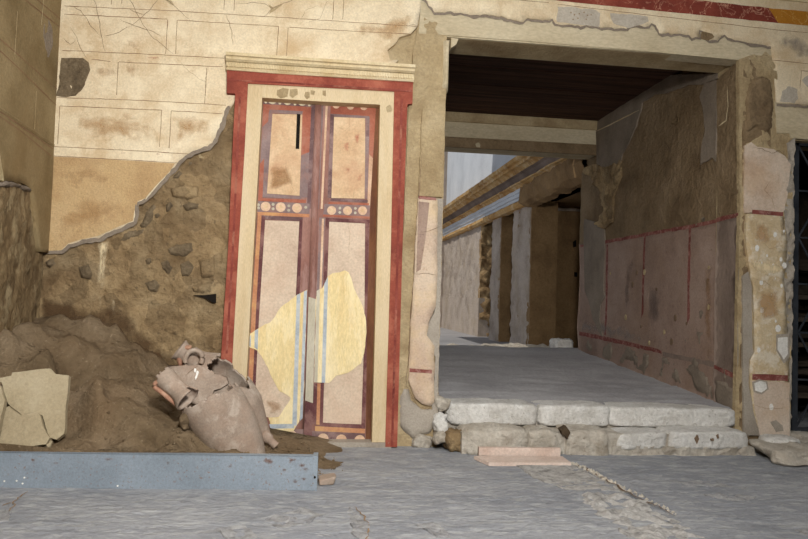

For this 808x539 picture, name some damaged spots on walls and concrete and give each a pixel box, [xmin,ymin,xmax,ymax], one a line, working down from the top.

flaking render [56,58,90,97]
crack [65,0,207,91]
crack [226,0,328,41]
flaking render [582,160,623,229]
flaking render [0,101,235,365]